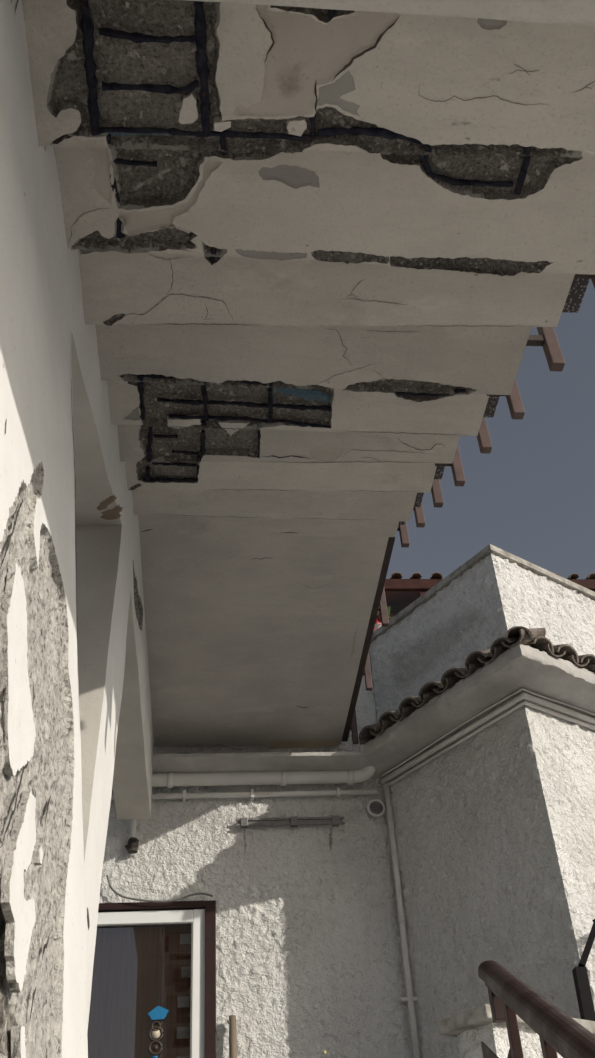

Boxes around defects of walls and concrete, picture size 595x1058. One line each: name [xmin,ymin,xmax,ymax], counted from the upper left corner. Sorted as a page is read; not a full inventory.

spalling [47,0,595,265]
crack [419,83,549,105]
crack [103,243,233,321]
crack [341,280,408,305]
spalling [119,374,478,490]
peeling [97,494,123,520]
flaking render [0,461,74,1058]